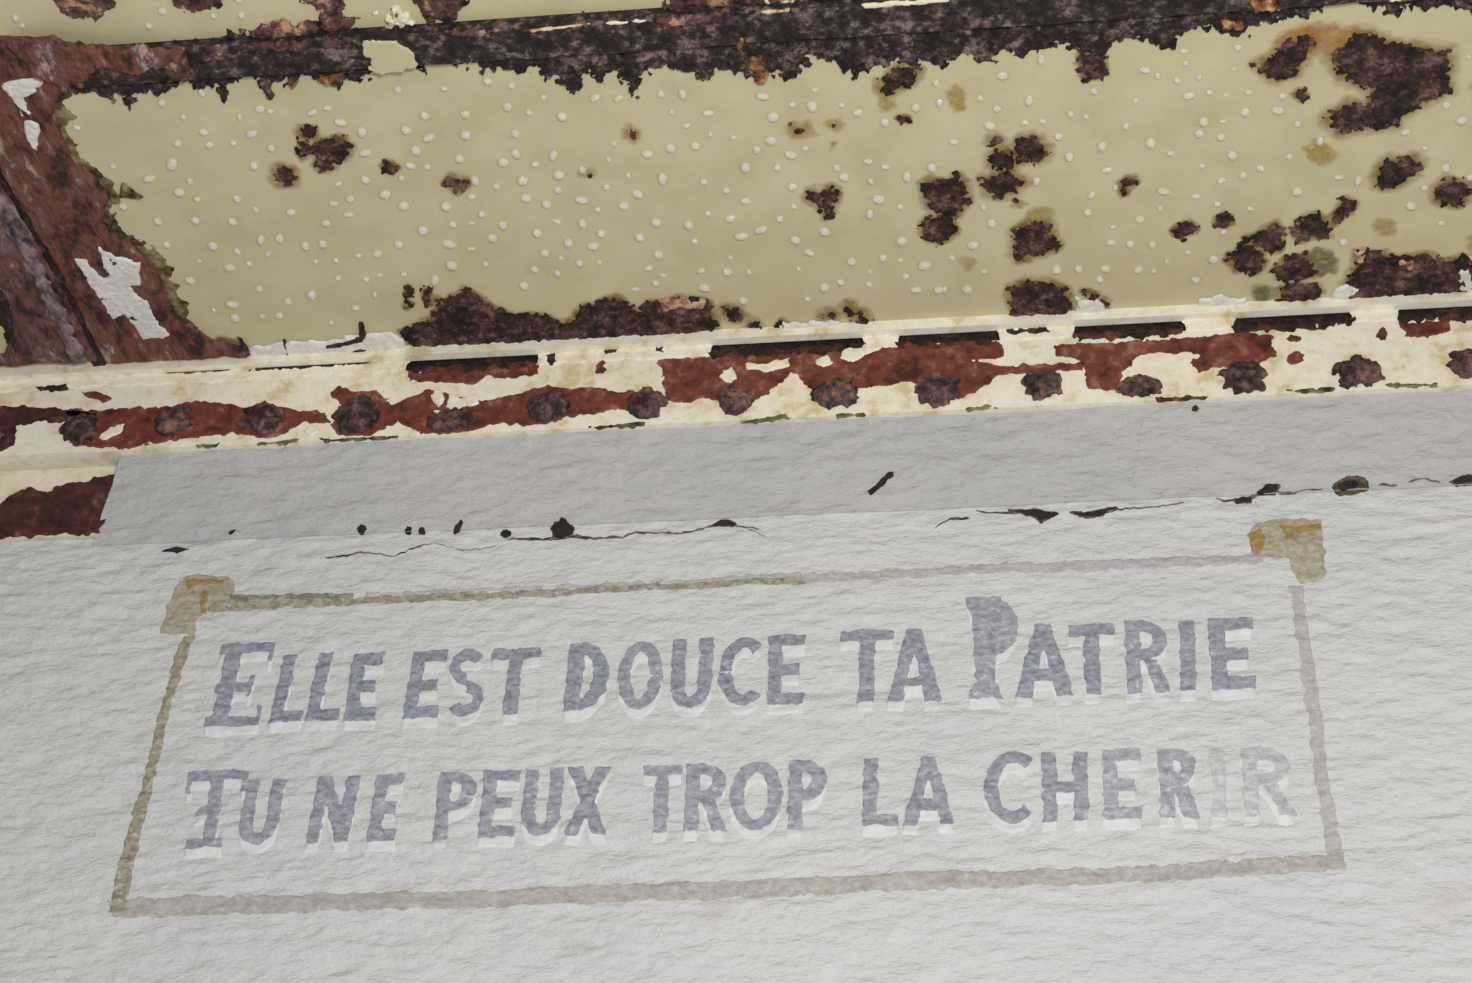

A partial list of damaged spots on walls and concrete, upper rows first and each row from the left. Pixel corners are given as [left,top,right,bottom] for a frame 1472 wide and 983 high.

rust [7,0,361,92]
rust [1249,26,1453,161]
rust [1373,155,1424,191]
rust [895,135,1113,350]
rust [1169,196,1472,333]
peeling [0,360,634,452]
peeling [249,331,406,357]
peeling [656,331,1304,403]
peeling [0,474,115,540]
crack [325,517,766,559]
crack [934,420,1322,529]
crack [1378,474,1472,487]